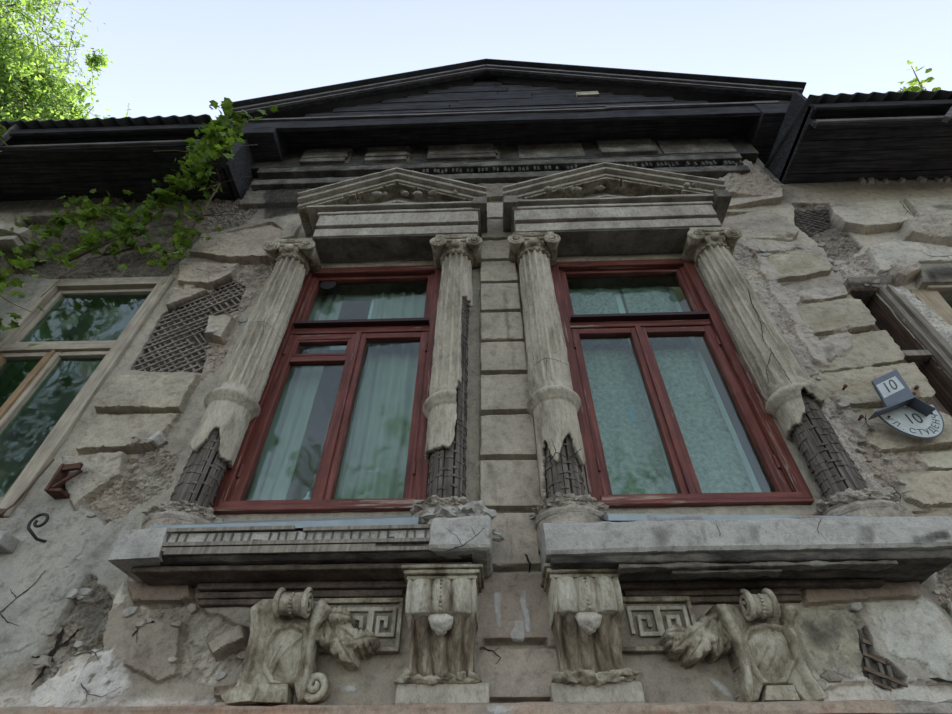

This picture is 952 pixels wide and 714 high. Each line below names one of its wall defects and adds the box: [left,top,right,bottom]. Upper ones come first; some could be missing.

spalling [189,256,273,383]
crack [747,288,792,383]
spalling [733,237,821,385]
spalling [791,202,952,346]
spalling [821,393,929,512]
crack [0,570,46,626]
spalling [29,574,248,707]